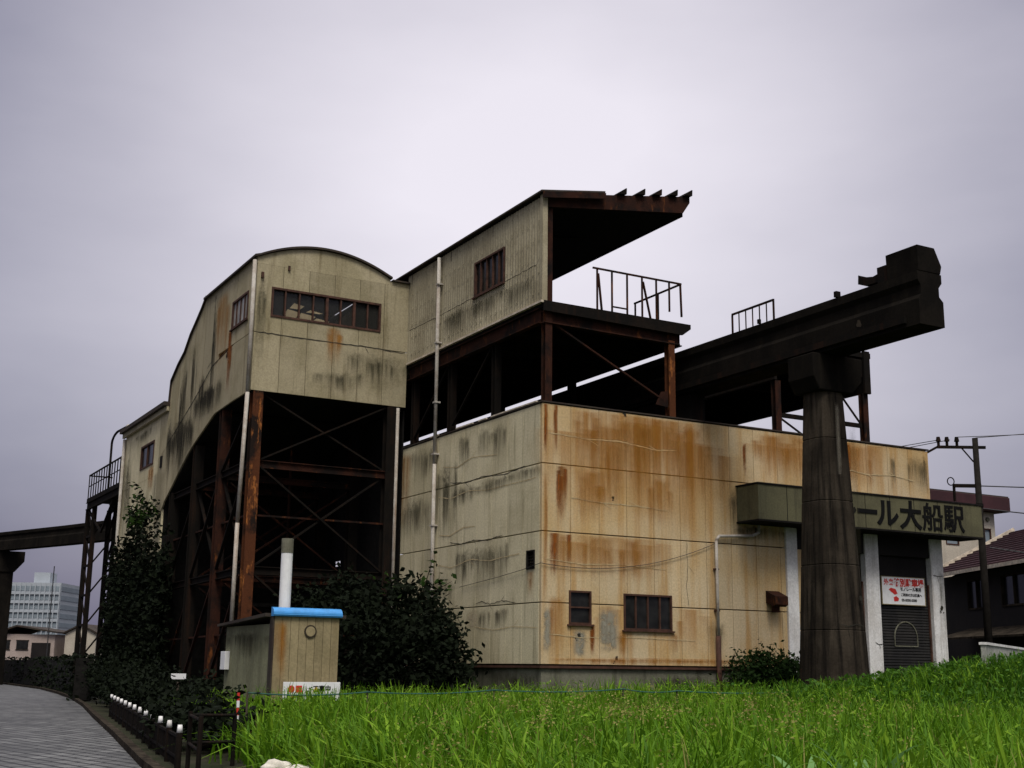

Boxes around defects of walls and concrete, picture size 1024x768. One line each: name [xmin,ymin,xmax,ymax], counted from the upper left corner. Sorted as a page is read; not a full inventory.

leakage [166,360,220,462]
corrosion [544,404,557,440]
crack [438,451,536,499]
corrosion [557,466,567,503]
crack [437,524,520,569]
corrosion [551,533,571,567]